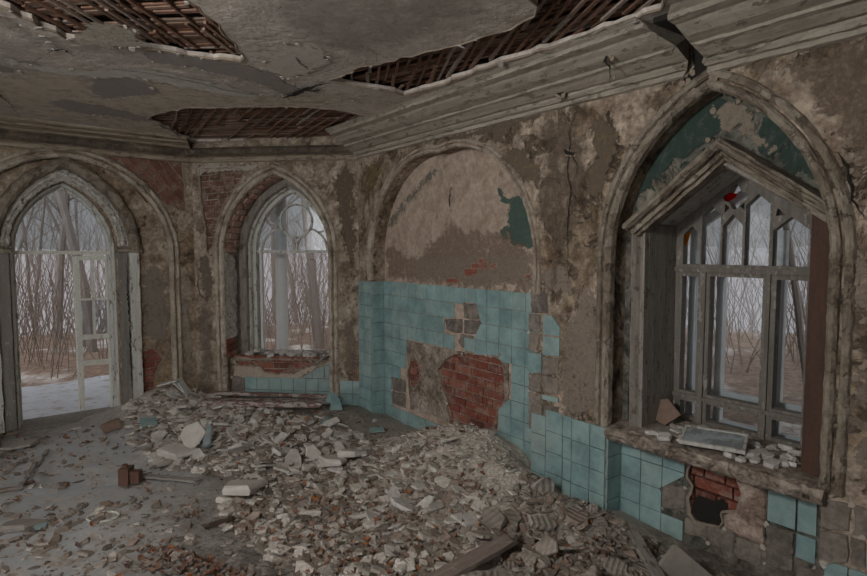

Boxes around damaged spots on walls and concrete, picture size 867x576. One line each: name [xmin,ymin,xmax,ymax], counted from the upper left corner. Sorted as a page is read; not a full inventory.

peeling [83,74,160,99]
flaking render [0,0,331,94]
flaking render [147,106,364,143]
flaking render [329,0,709,96]
peeling [636,93,818,201]
spalling [101,155,283,300]
peeling [498,188,533,249]
spalling [142,347,163,392]
spalling [391,303,510,433]
peeling [661,464,867,576]